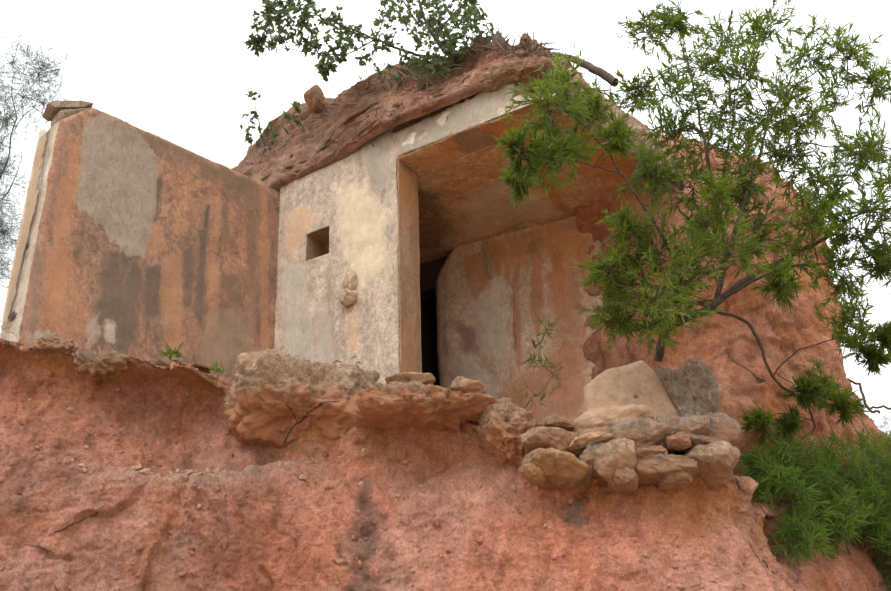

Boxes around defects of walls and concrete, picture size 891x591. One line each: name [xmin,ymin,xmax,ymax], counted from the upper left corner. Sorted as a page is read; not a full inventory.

peeling [51,108,210,260]
damp [121,120,258,285]
damp [93,250,165,355]
damp [182,204,253,366]
peeling [450,350,501,399]
peeling [459,275,517,365]